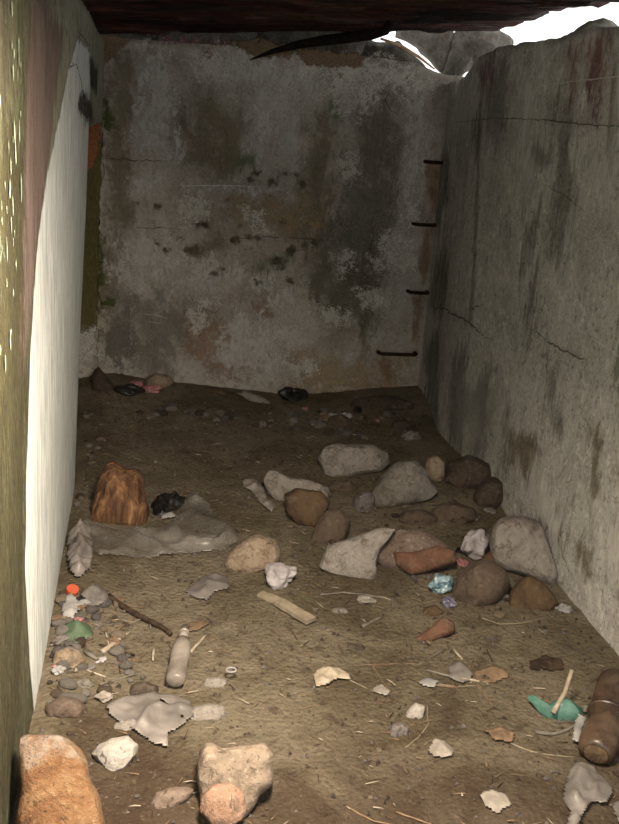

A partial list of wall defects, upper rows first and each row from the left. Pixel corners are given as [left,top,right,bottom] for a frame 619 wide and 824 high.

damp [0,0,434,820]
crack [453,118,619,127]